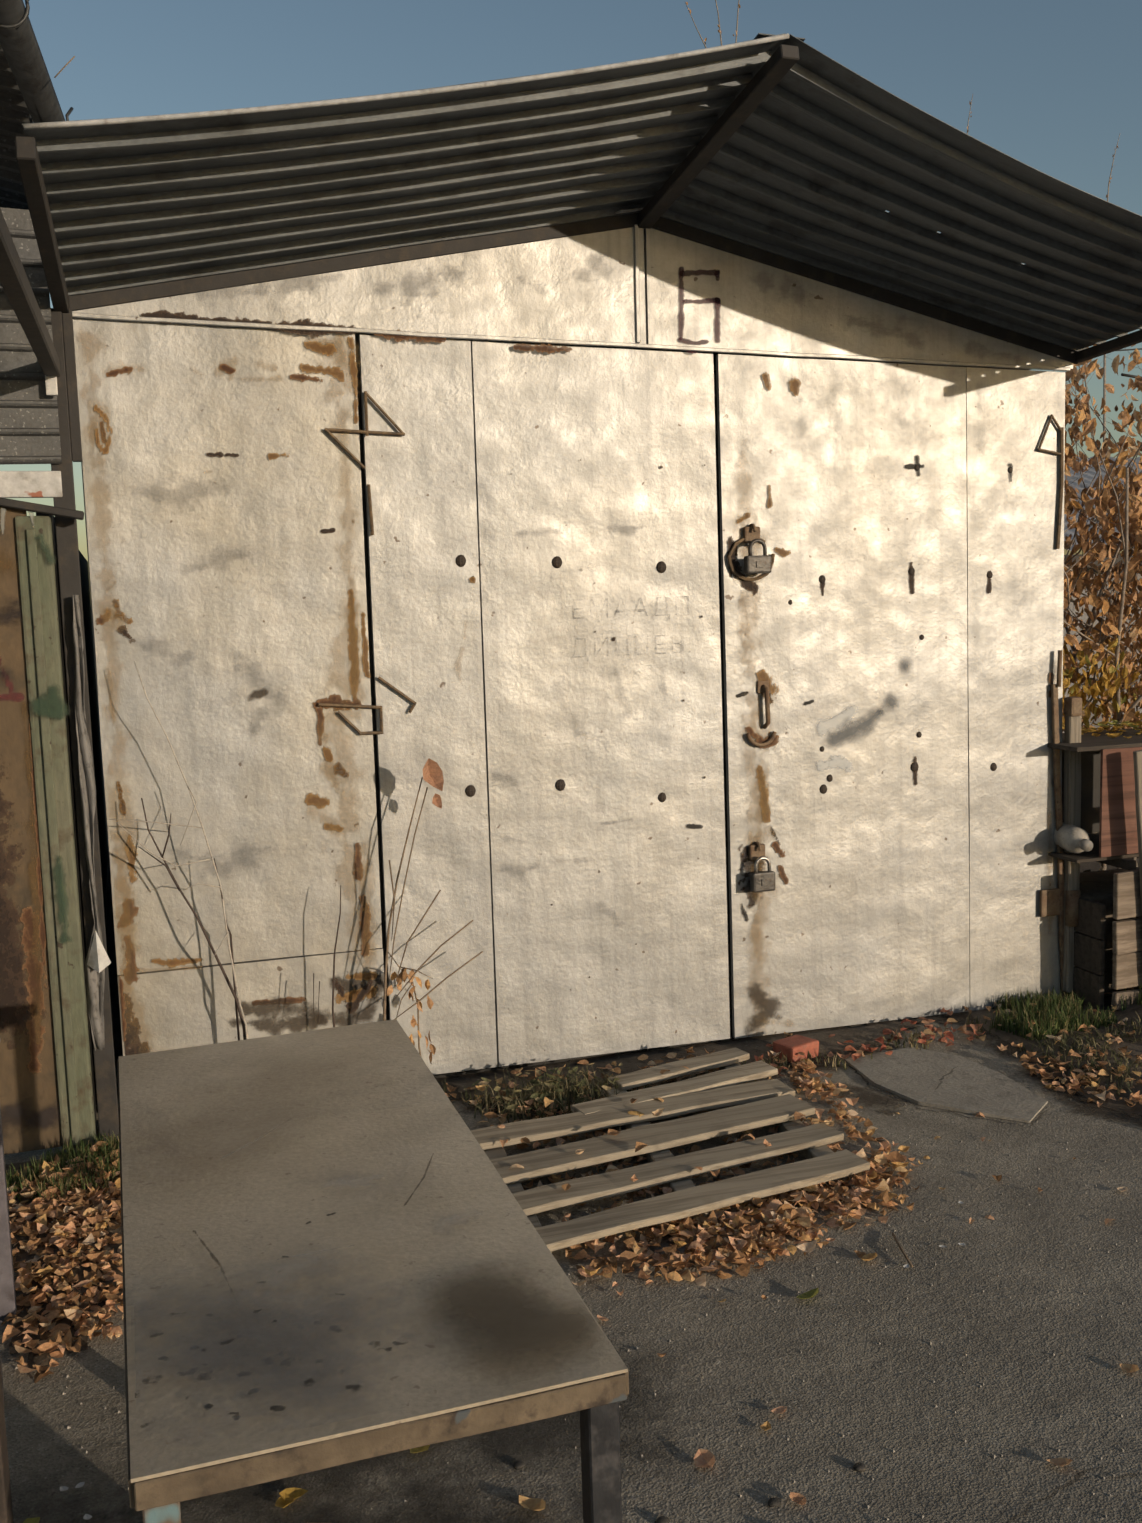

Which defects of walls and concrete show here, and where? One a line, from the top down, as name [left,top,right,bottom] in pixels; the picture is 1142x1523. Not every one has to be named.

rust [106,366,133,377]
rust [141,310,359,424]
rust [374,330,446,343]
rust [513,343,572,354]
rust [728,512,759,595]
rust [96,599,133,639]
rust [313,589,371,778]
rust [305,793,344,832]
rust [745,726,779,823]
rust [738,841,789,908]
rust [0,766,50,1074]
rust [231,842,384,1036]